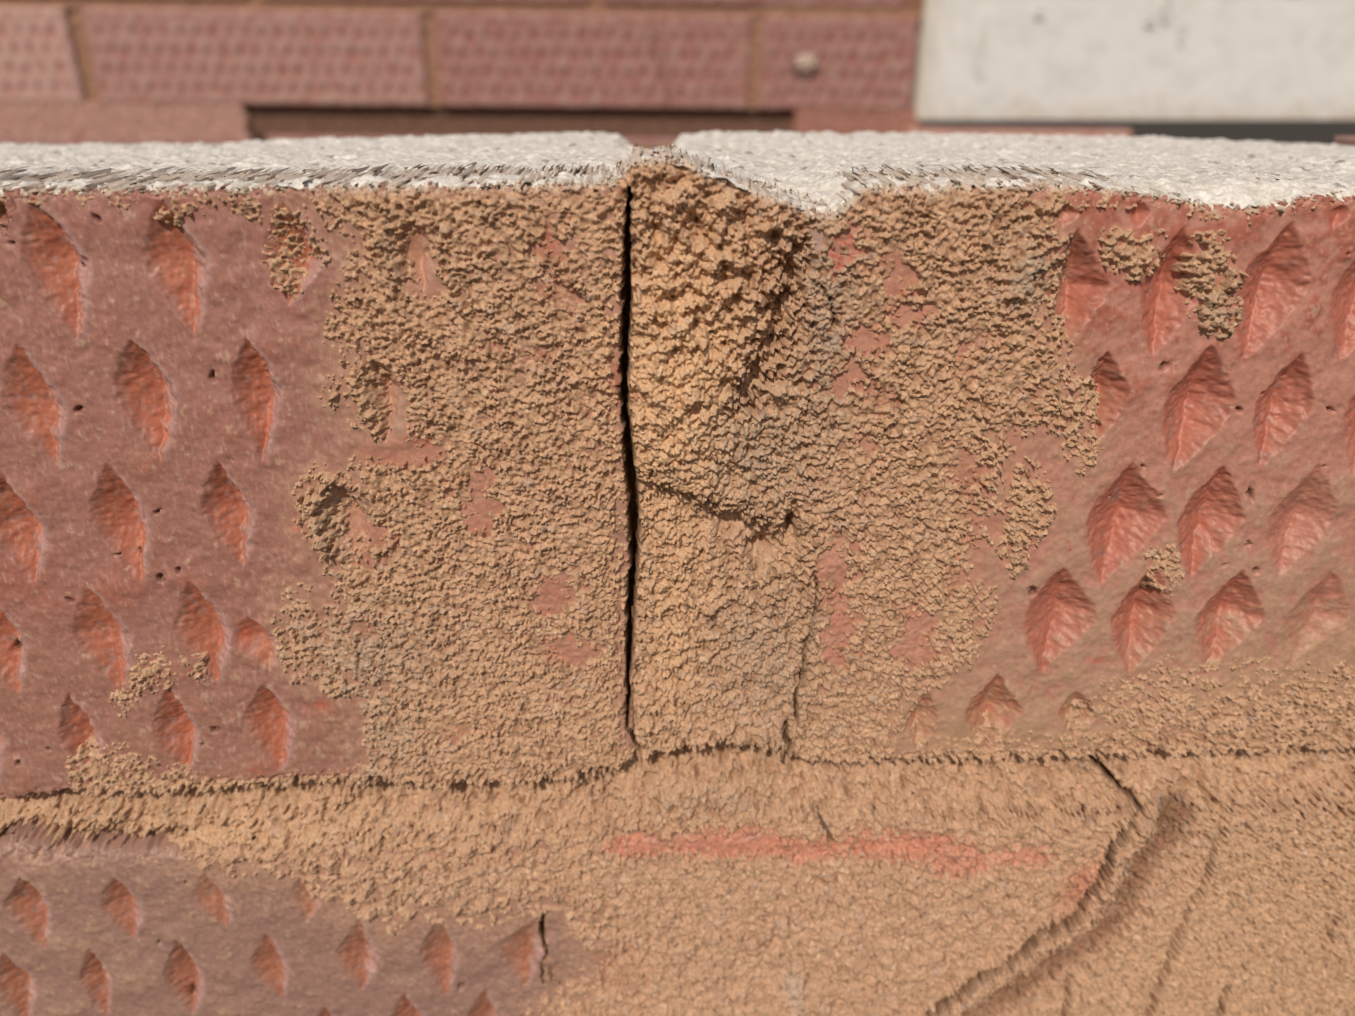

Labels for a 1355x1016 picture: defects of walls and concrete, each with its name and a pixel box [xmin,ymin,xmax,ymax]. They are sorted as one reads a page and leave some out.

peeling [826,224,871,283]
crack [615,185,644,758]
crack [781,571,819,757]
crack [925,755,1148,1016]